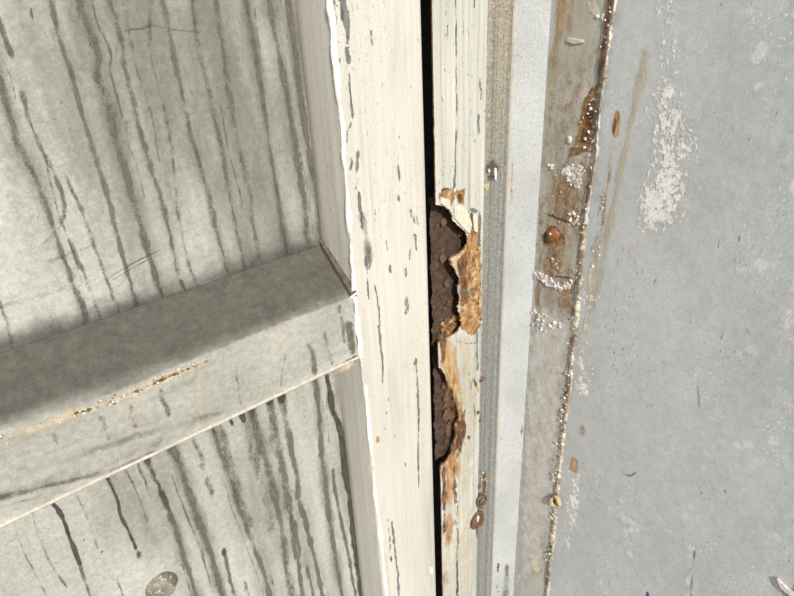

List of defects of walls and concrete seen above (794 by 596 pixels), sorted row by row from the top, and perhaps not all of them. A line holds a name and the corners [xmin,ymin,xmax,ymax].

rust [550,0,590,70]
rust [439,166,482,335]
rust [535,81,597,311]
rust [589,56,646,312]
peeling [441,380,459,444]
rust [440,337,474,596]
peeling [466,330,484,423]